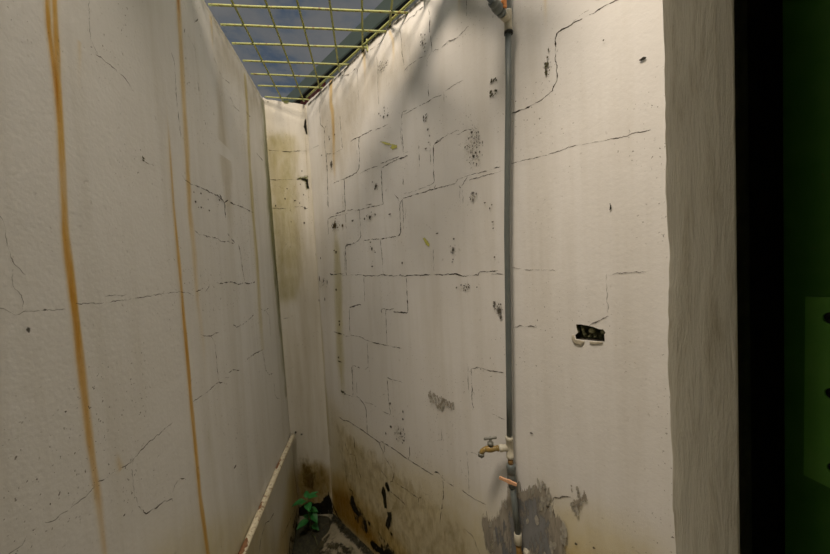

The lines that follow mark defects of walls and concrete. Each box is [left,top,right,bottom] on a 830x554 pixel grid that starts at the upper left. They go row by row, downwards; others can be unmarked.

crack [342,1,467,103]
crack [513,0,617,113]
crack [0,180,254,315]
crack [258,81,649,519]
spalling [572,324,605,345]
damp [349,483,394,554]
peeling [482,477,567,554]